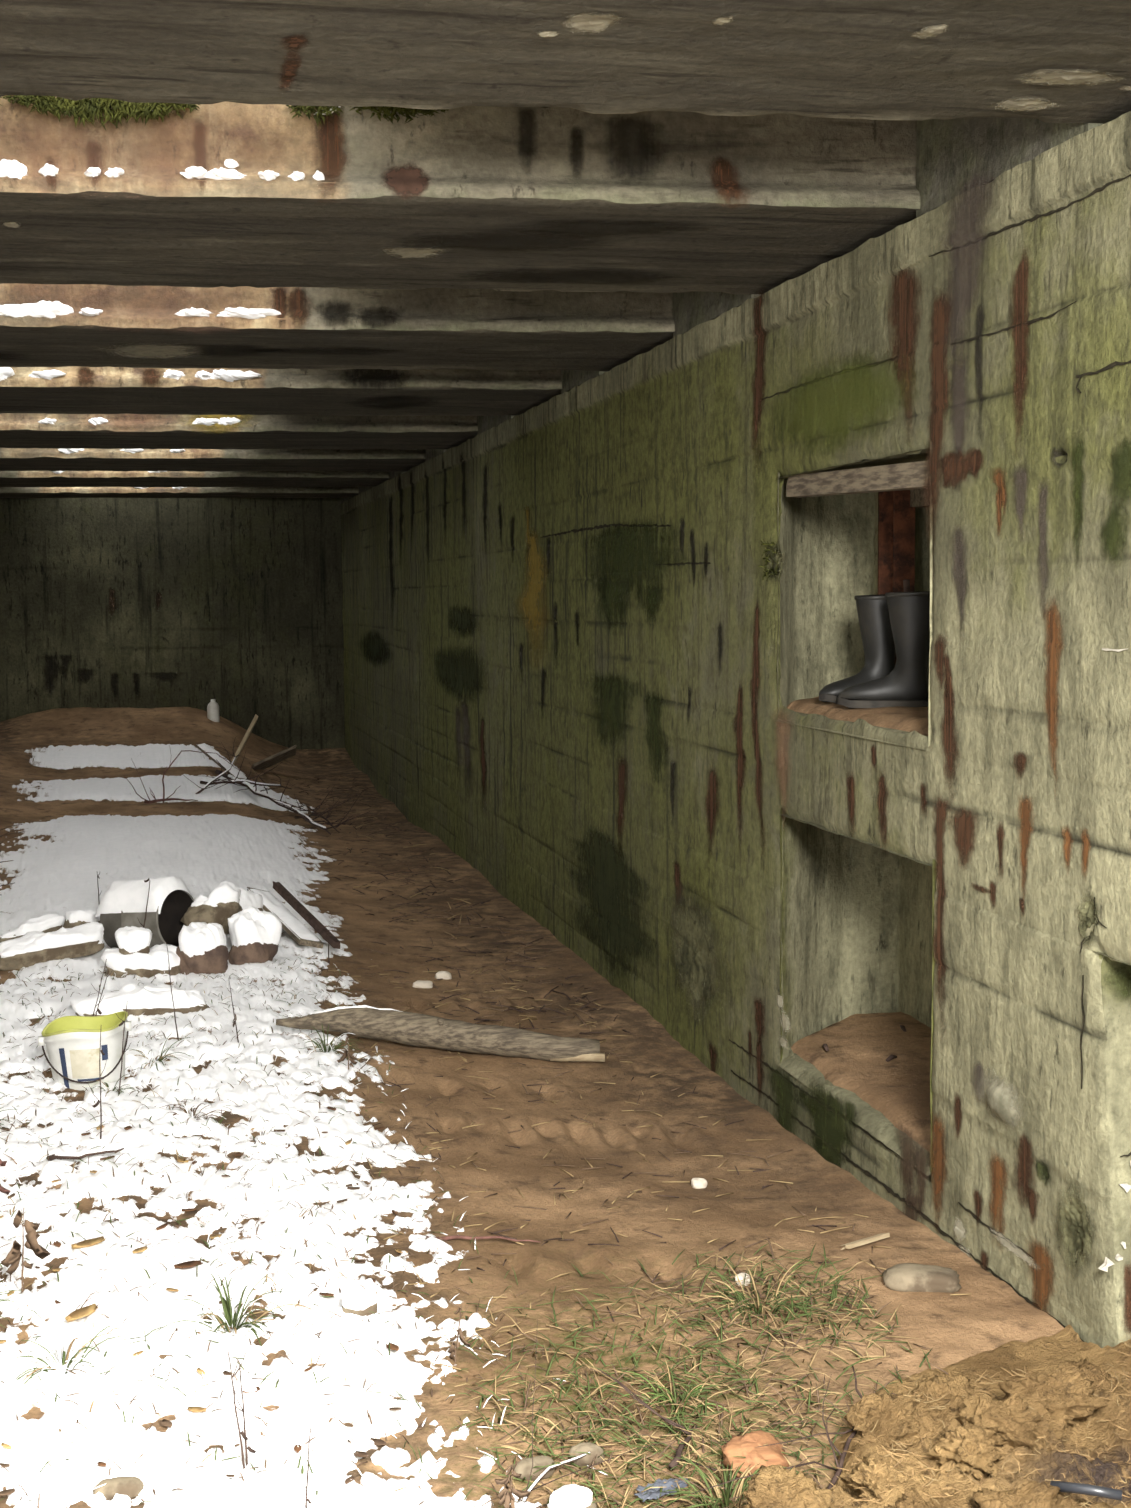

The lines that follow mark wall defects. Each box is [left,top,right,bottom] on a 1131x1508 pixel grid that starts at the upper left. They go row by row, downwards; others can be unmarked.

leakage [519,109,536,166]
leakage [570,129,583,174]
leakage [608,117,659,179]
crack [929,174,1131,257]
corrosion [888,268,1007,537]
corrosion [1012,256,1030,432]
crack [1076,360,1131,393]
corrosion [1046,605,1063,775]
corrosion [847,776,855,827]
corrosion [871,745,888,846]
corrosion [921,636,978,1002]
corrosion [972,799,1032,915]